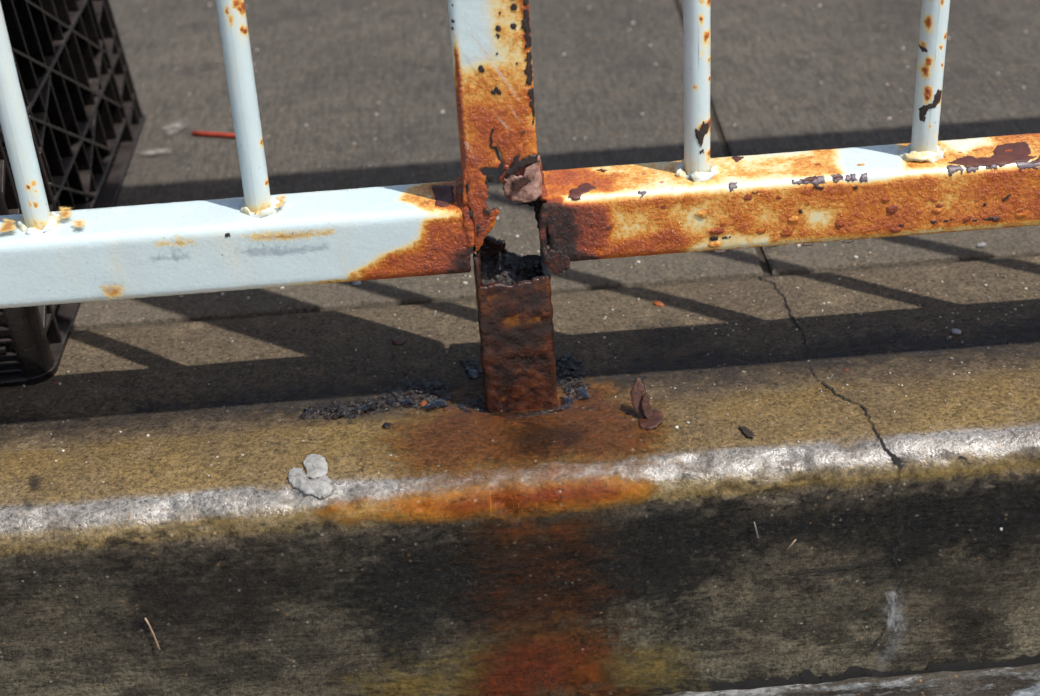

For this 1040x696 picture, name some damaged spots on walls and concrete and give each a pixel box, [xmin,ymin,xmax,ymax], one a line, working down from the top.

peeling [948,133,1040,168]
peeling [504,155,542,203]
rust [694,210,726,248]
rust [881,196,898,214]
crack [576,276,1040,696]
rust [320,377,692,696]
water stain [97,472,1040,669]